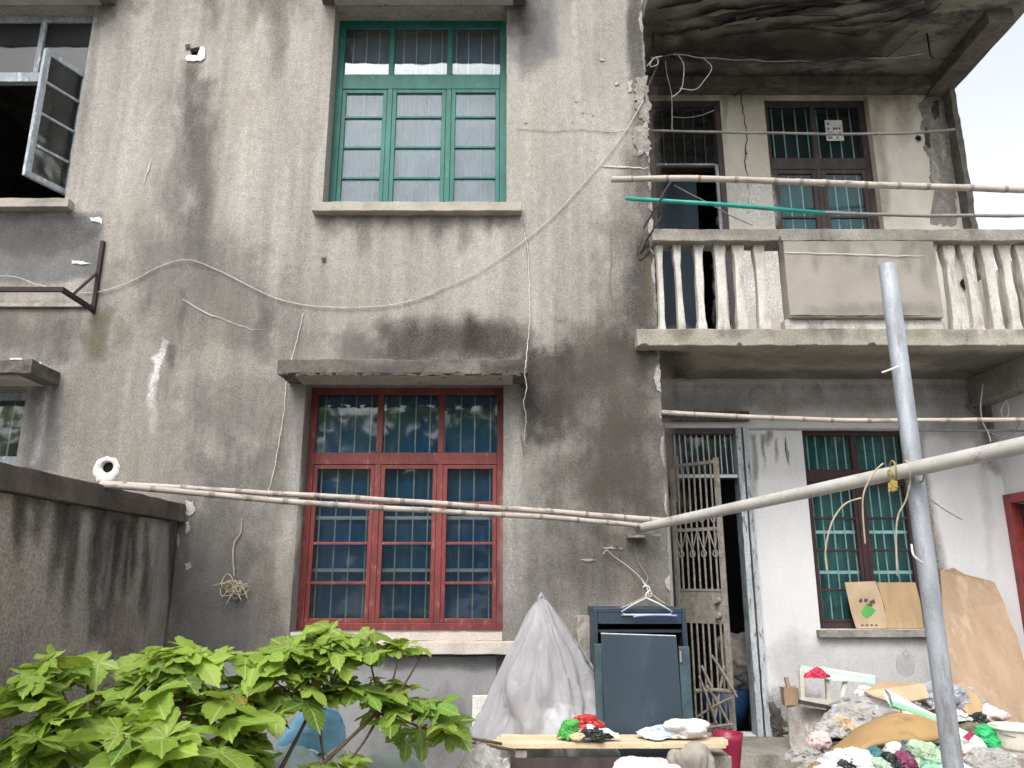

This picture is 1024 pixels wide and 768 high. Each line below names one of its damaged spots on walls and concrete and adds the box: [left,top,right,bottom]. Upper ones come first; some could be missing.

spalling [185,43,205,61]
damp [627,0,897,78]
spalling [615,0,657,312]
crack [740,95,750,205]
flaking render [914,95,958,227]
damp [343,317,665,516]
spalling [639,343,680,393]
damp [55,503,80,593]
damp [90,511,149,610]
flaking render [176,500,195,546]